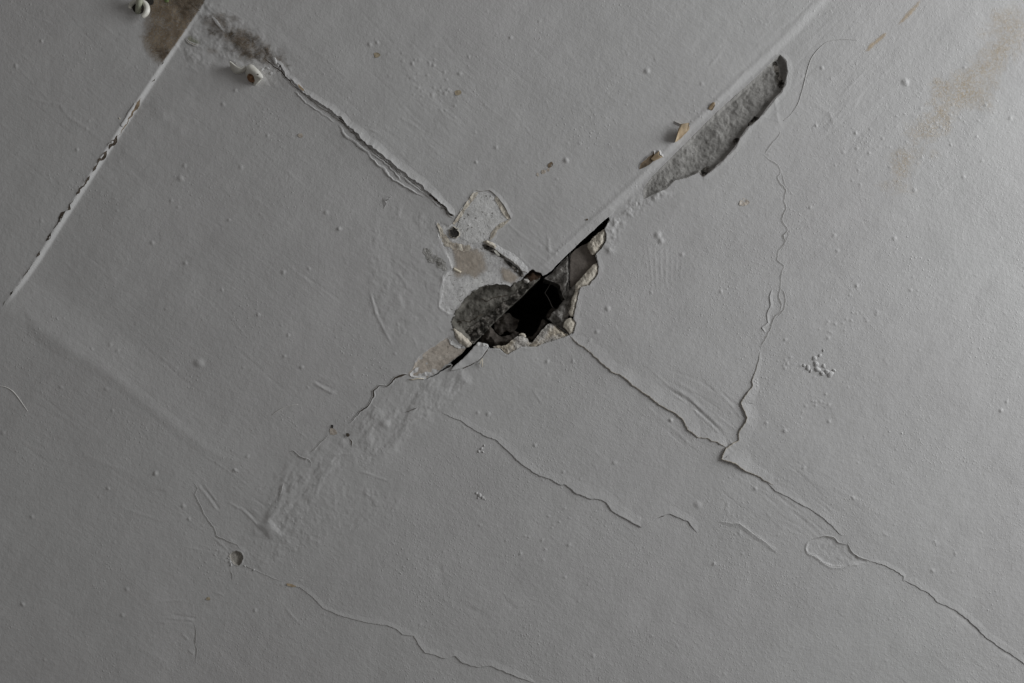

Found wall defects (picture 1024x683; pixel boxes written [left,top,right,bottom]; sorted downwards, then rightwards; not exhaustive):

leakage [145,0,204,59]
leakage [212,18,281,61]
crack [2,61,164,306]
crack [260,57,456,219]
spalling [638,53,793,199]
crack [760,130,789,349]
crack [289,364,452,467]
spalling [409,187,870,571]